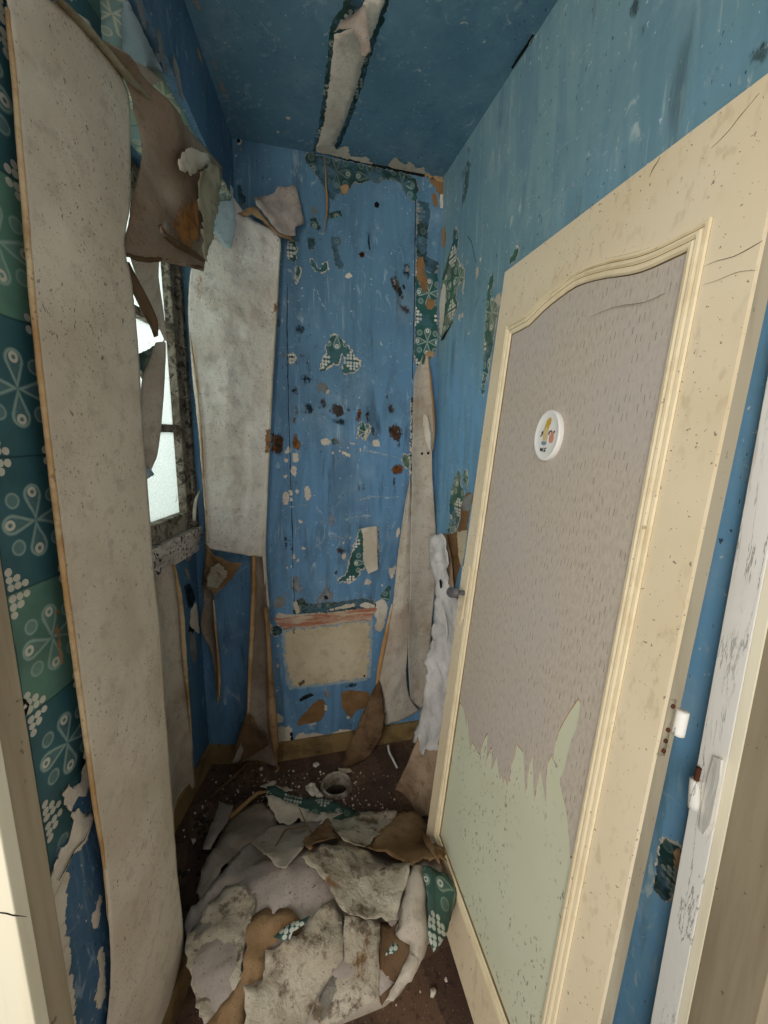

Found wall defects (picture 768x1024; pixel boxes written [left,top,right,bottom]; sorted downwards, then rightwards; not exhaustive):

peeling [286,236,352,282]
peeling [304,152,501,408]
peeling [283,446,299,478]
peeling [321,421,380,458]
peeling [401,397,413,491]
peeling [282,486,312,505]
flaking render [270,529,396,742]
peeling [653,837,682,904]
peeling [91,895,103,929]
spalling [55,872,77,1024]
peeling [93,946,106,1009]